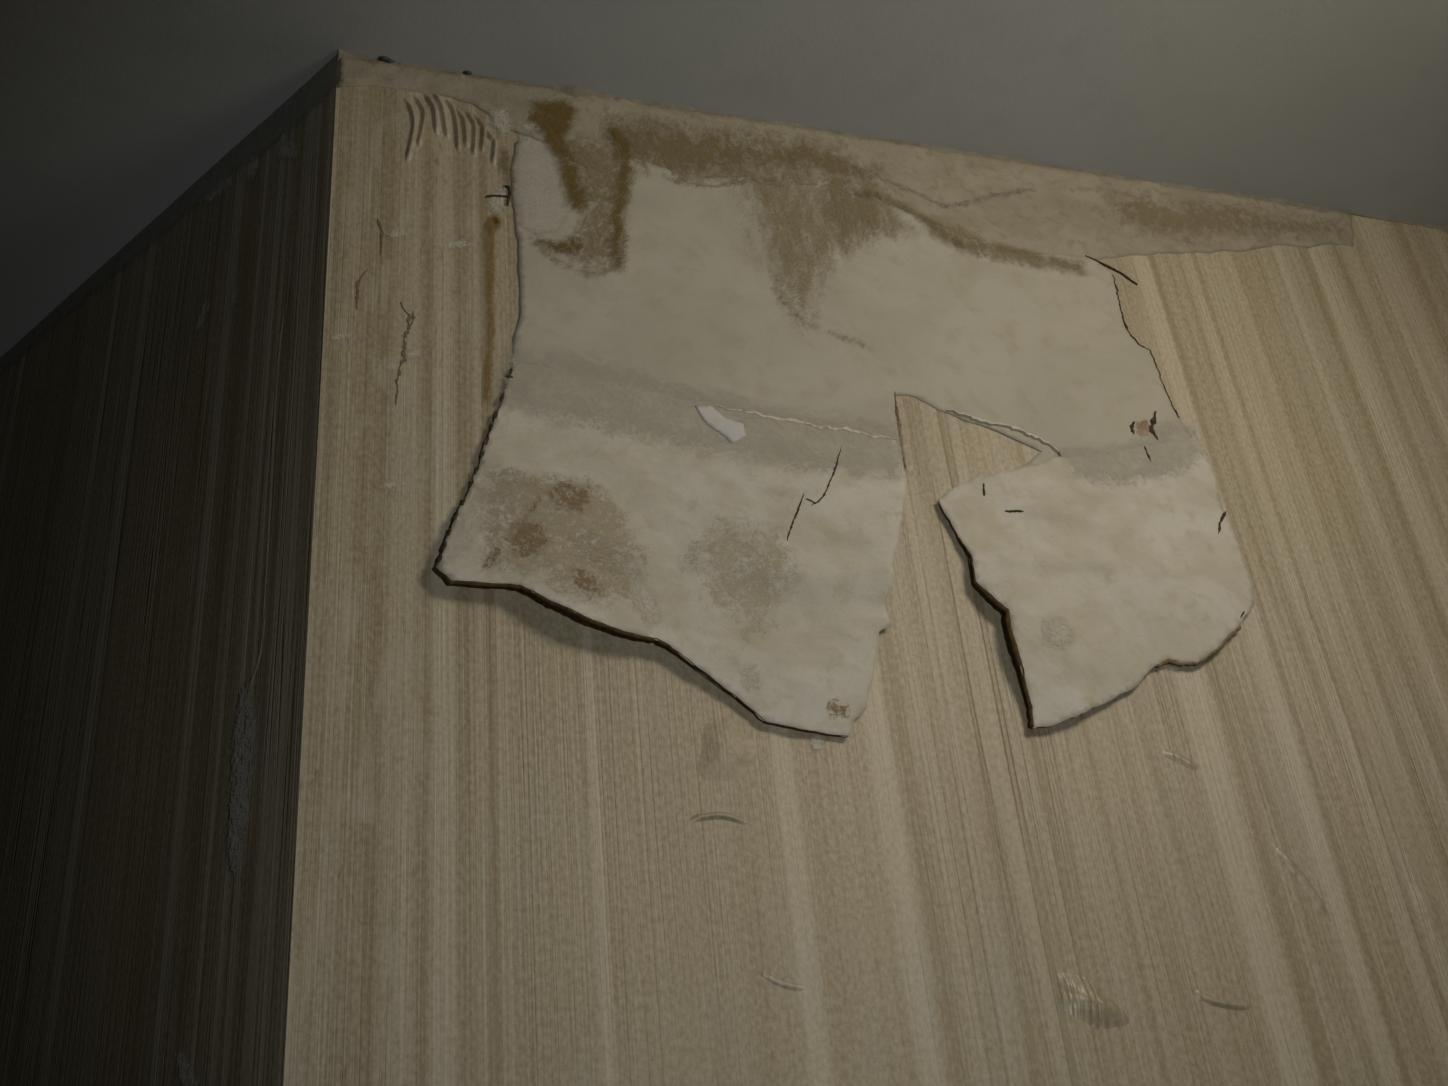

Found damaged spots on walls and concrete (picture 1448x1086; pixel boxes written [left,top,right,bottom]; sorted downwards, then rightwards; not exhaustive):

leakage [523,97,1093,351]
flaking render [337,58,1354,478]